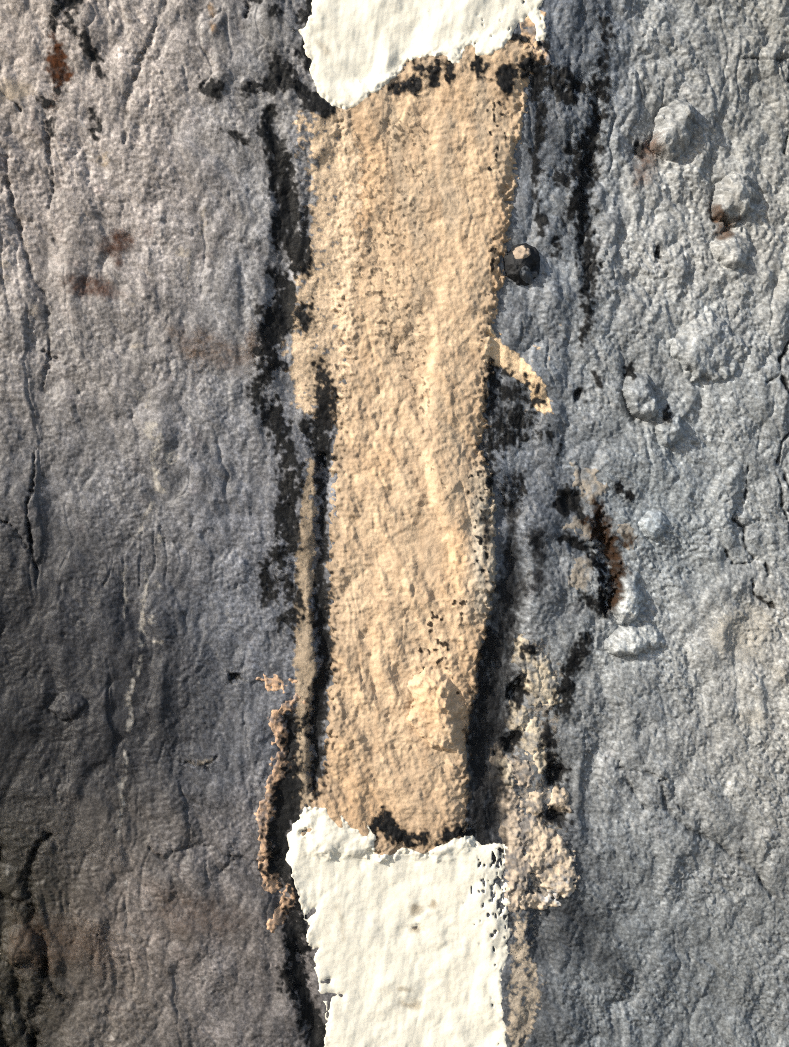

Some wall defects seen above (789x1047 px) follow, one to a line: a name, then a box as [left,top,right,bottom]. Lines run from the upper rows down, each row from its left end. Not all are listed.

rust [46,33,74,88]
damp [48,0,107,78]
damp [88,107,102,141]
damp [220,0,339,1047]
flaking render [308,10,551,855]
damp [367,357,611,863]
spalling [563,515,594,592]
crack [724,467,774,608]
crack [767,341,789,393]
crack [776,433,789,516]
spalling [254,674,306,933]
spalling [489,634,581,913]